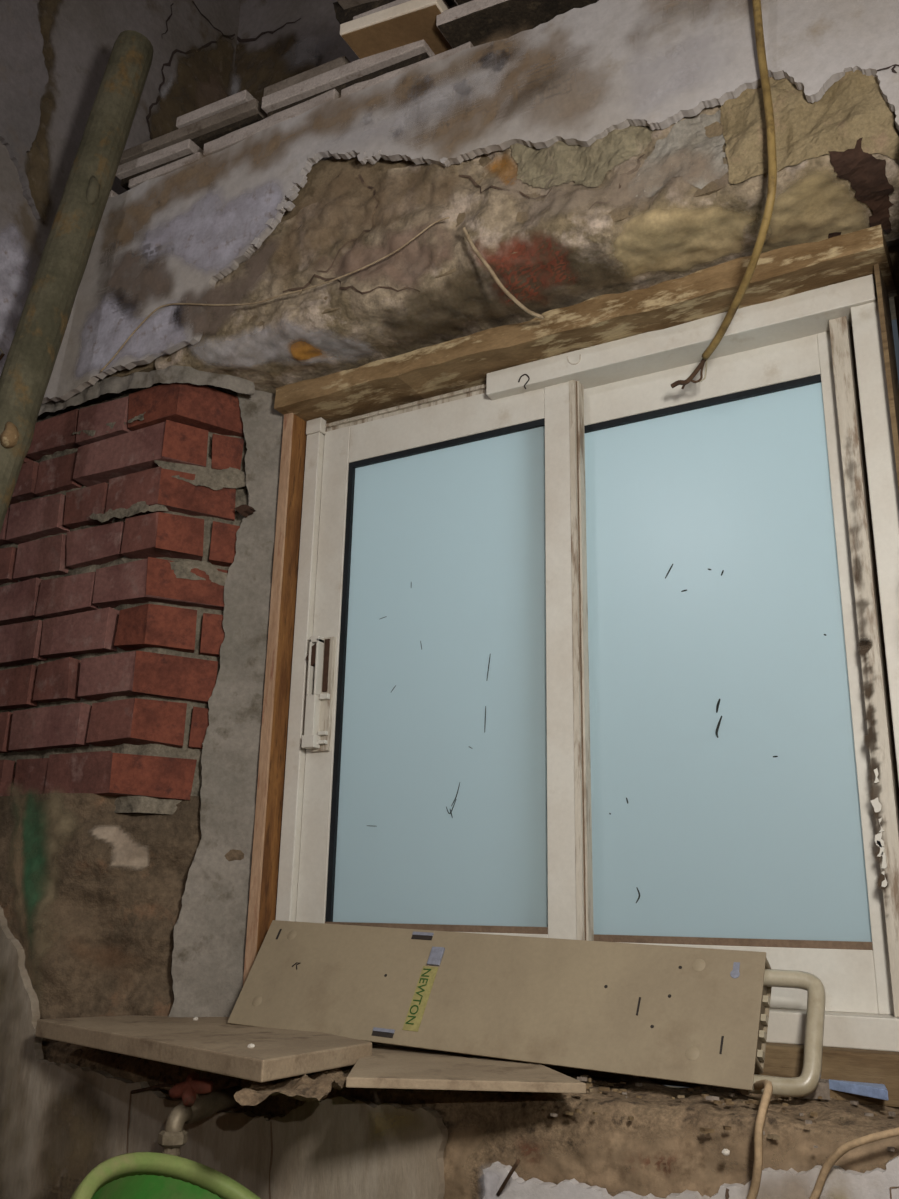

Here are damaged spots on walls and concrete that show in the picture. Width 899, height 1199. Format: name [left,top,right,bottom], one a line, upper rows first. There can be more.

crack [146,1,301,140]
crack [877,64,899,73]
flaking render [265,151,318,229]
leakage [76,35,610,376]
crack [283,174,420,294]
crack [459,175,552,199]
flaking render [485,239,574,304]
peeling [720,70,899,233]
flaking render [210,327,370,365]
peeling [518,1129,899,1199]